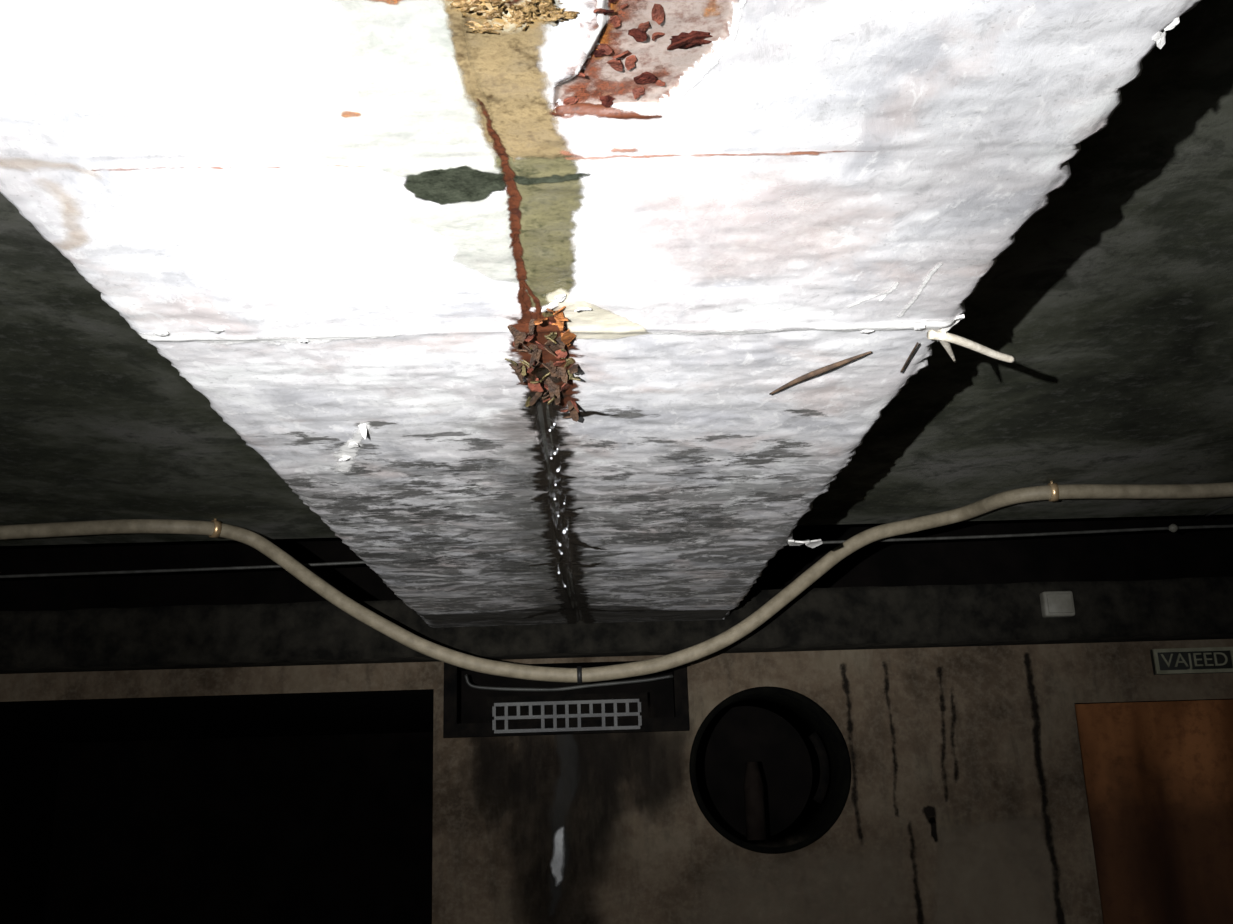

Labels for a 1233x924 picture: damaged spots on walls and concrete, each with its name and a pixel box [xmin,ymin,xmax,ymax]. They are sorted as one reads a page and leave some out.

rust [450,0,580,35]
spalling [550,0,746,119]
crack [477,99,541,324]
rust [505,306,583,422]
crack [522,368,617,624]
damp [471,706,683,924]
crack [840,665,863,839]
crack [883,664,924,924]
crack [937,667,958,801]
crack [1024,653,1065,924]